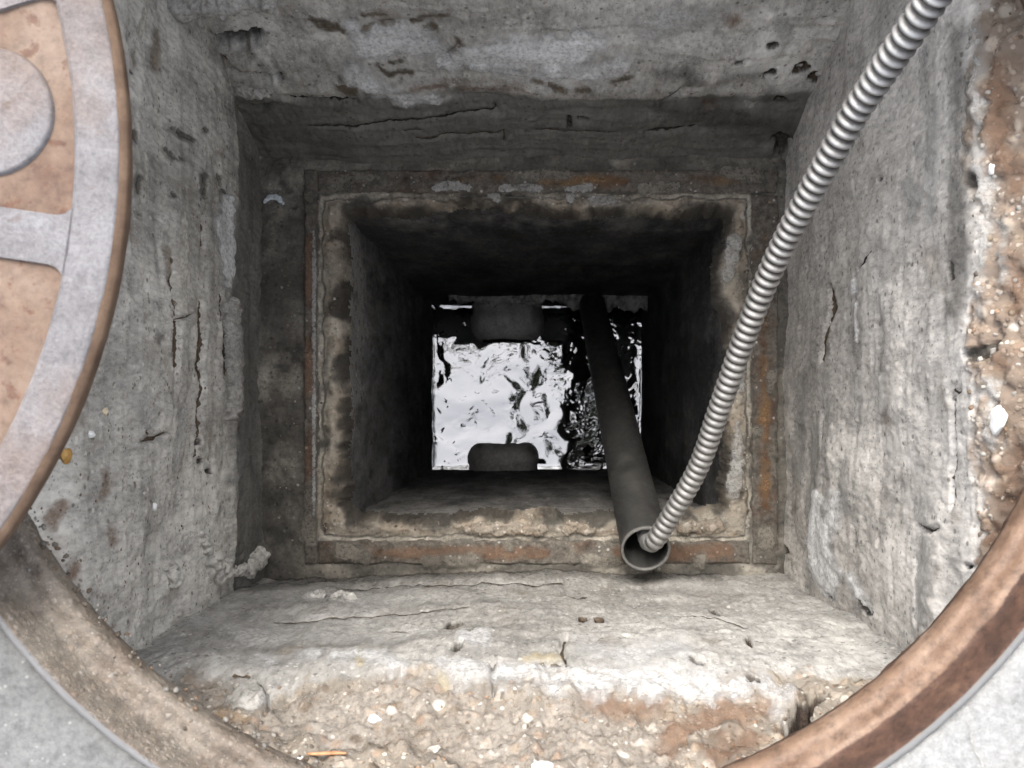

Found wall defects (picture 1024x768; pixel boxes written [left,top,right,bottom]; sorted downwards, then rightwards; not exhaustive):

spalling [792,61,822,82]
crack [260,72,505,141]
crack [167,257,226,457]
crack [823,288,838,361]
crack [274,582,587,634]